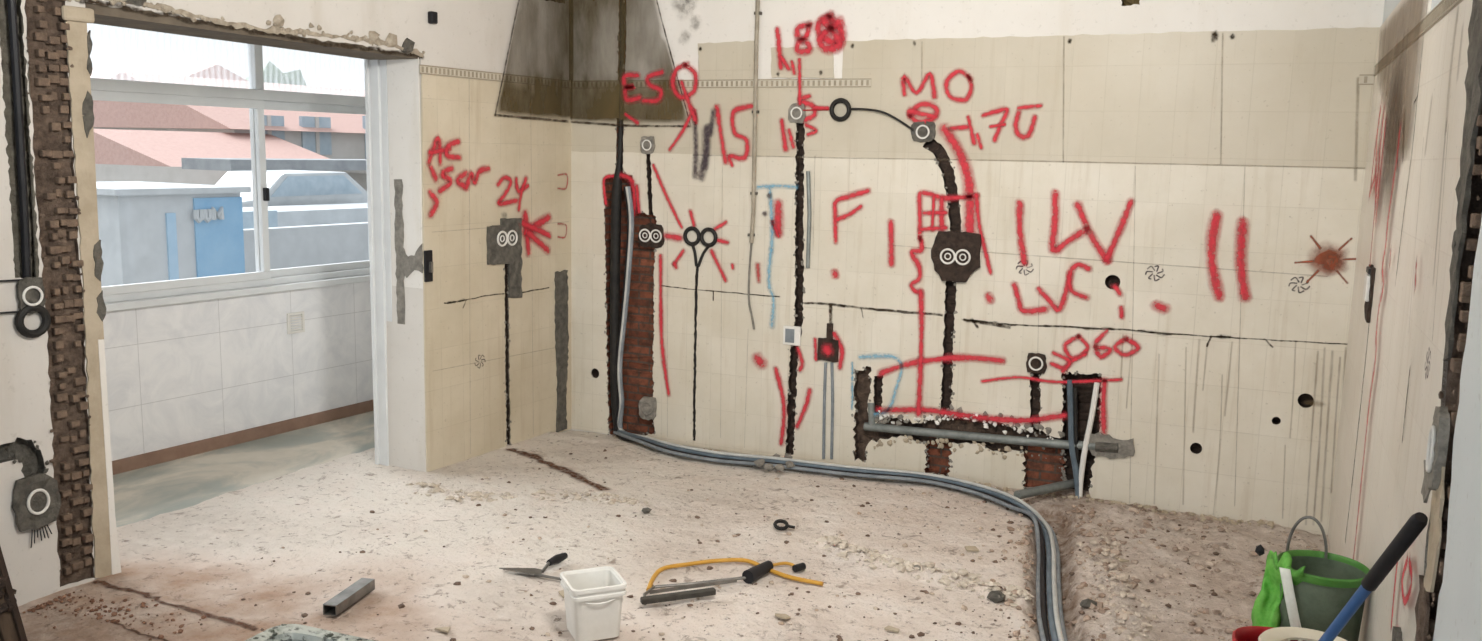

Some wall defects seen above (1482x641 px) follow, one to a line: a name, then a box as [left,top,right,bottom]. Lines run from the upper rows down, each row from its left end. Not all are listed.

spalling [61,0,425,138]
water stain [1378,0,1422,188]
spalling [93,240,106,322]